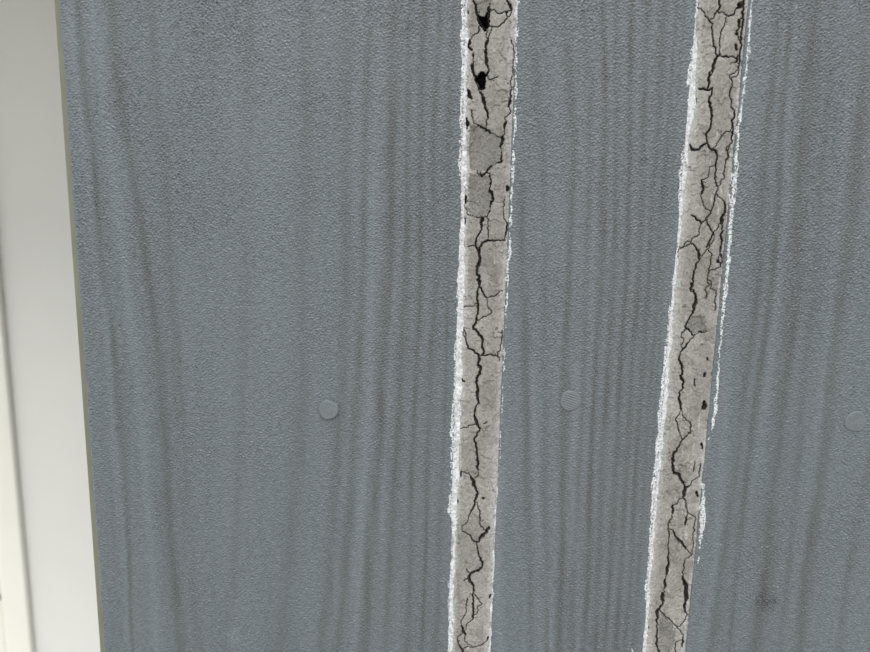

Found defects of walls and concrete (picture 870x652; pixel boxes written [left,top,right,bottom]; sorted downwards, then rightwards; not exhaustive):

spalling [468,0,490,16]
peeling [735,0,753,81]
spalling [464,40,518,316]
crack [457,0,515,652]
crack [668,0,739,558]
peeling [694,330,723,449]
peeling [693,464,706,564]
crack [656,587,684,652]